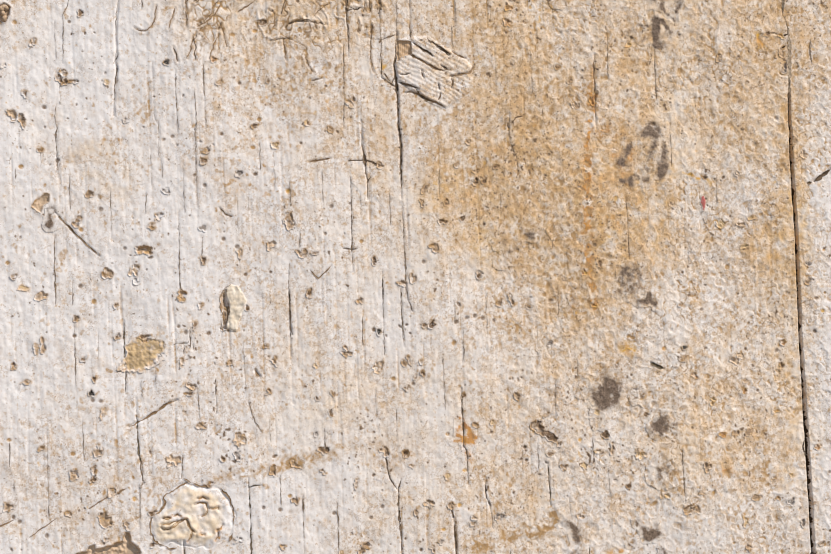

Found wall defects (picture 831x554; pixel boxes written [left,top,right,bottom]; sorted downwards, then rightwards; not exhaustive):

spalling [0,2,11,24]
crack [337,0,361,124]
crack [343,146,377,263]
crack [379,1,413,355]
leakage [349,0,831,554]
crack [772,0,813,548]
rust [448,412,485,473]
spalling [77,511,141,554]